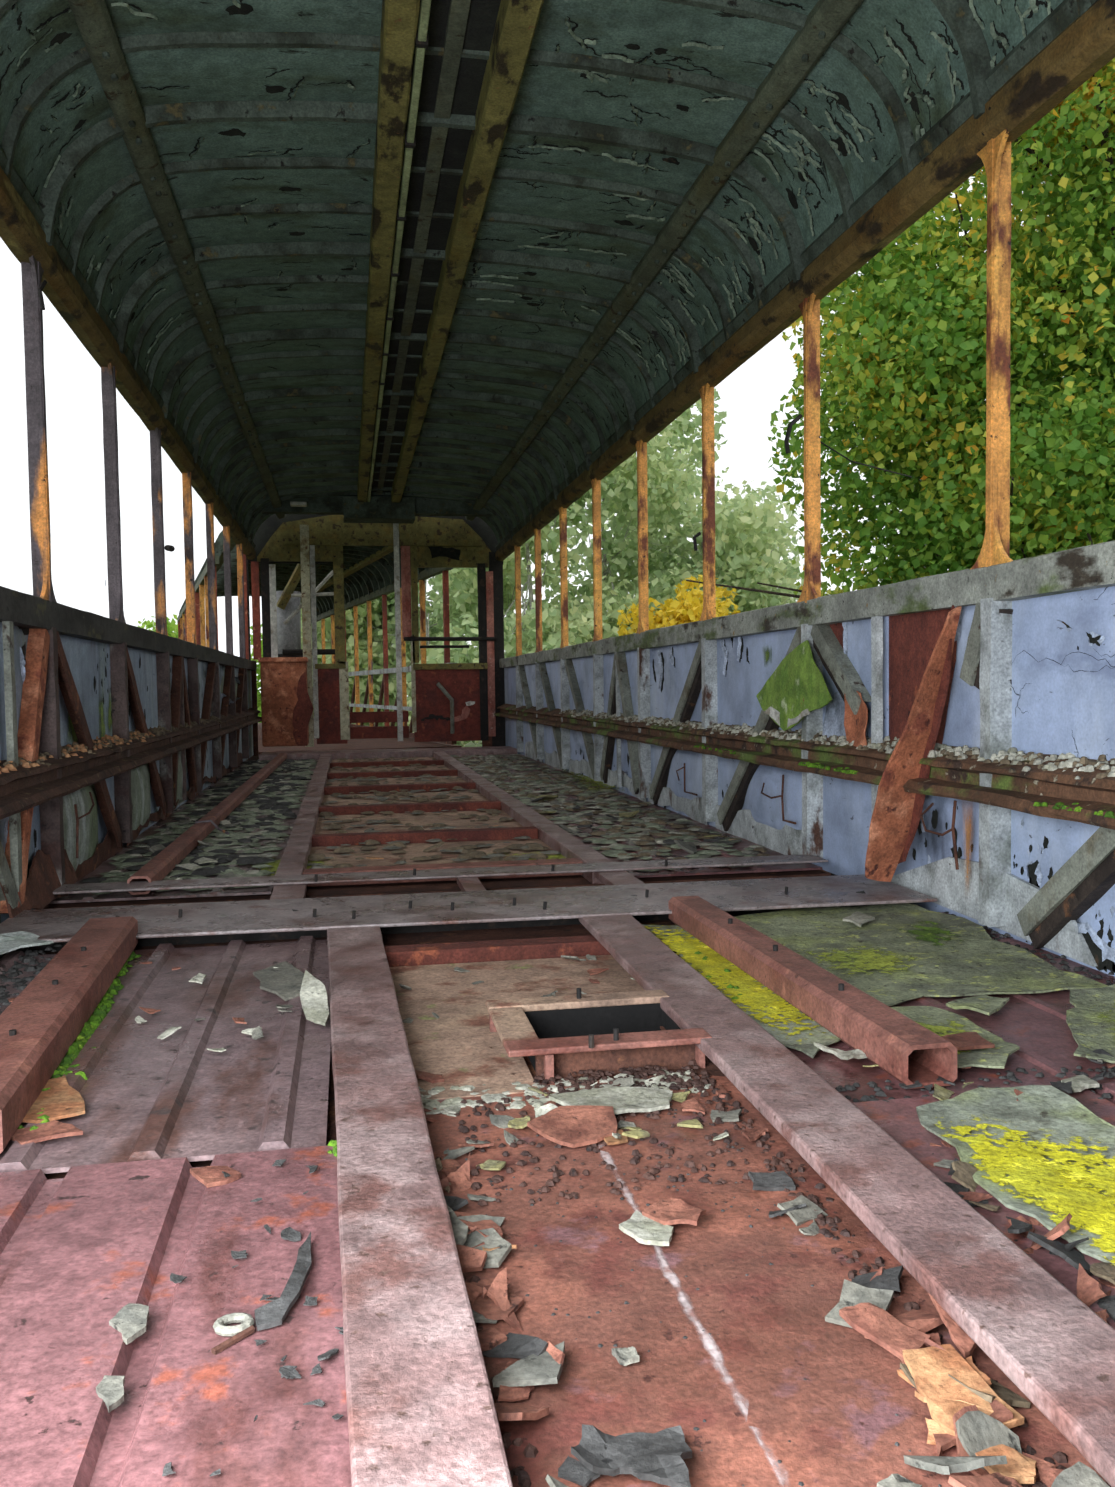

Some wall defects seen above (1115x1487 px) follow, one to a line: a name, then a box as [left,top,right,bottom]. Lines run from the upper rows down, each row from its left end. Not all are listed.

rust [889,607,963,744]
rust [435,1154,523,1332]
rust [492,1341,565,1421]